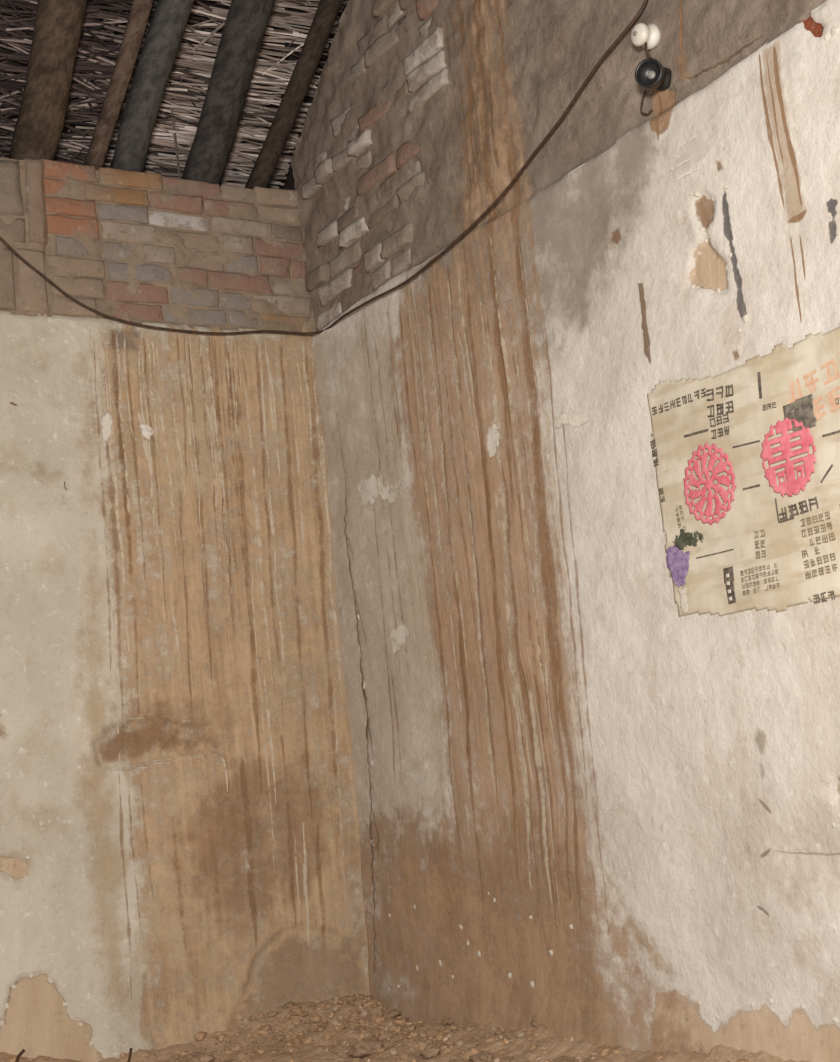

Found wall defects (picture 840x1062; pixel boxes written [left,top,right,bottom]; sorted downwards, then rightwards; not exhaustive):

spalling [690,186,748,333]
water stain [97,0,674,1052]
flaking render [0,974,104,1062]
water stain [650,990,840,1062]